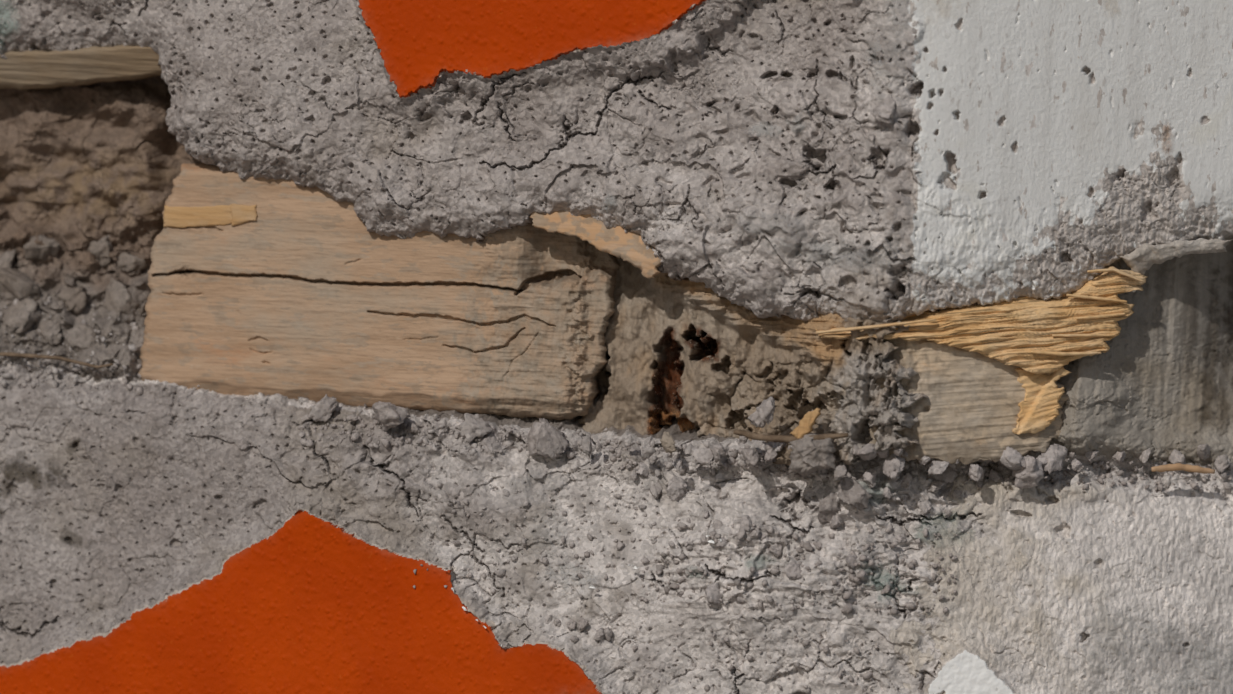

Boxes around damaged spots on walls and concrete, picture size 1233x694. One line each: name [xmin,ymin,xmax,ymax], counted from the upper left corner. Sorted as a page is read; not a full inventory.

spalling [0,0,921,324]
crack [473,72,671,171]
peeling [908,135,924,165]
spalling [910,81,924,97]
peeling [906,152,1233,316]
rust [647,329,719,435]
crack [365,446,505,598]
spalling [0,257,1233,694]
crack [771,516,812,534]
crack [876,513,982,526]
crack [707,567,780,583]
crack [873,573,919,619]